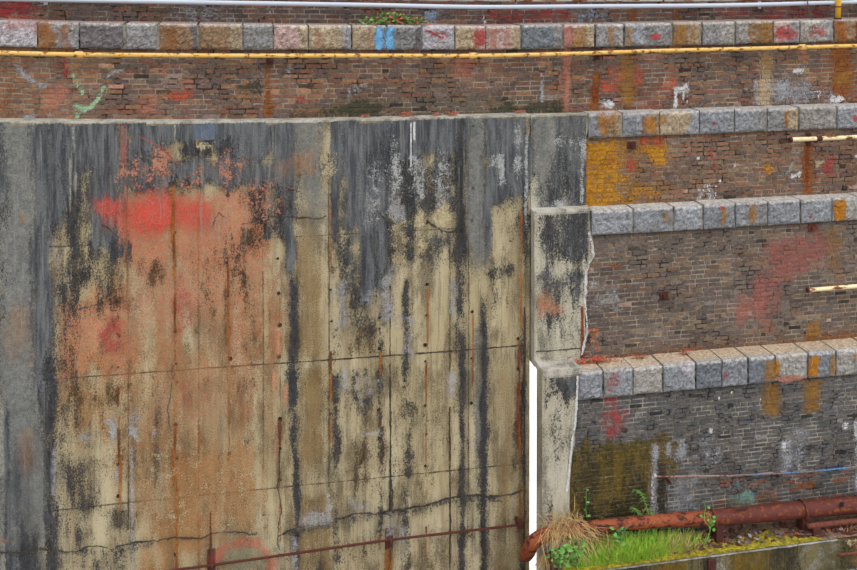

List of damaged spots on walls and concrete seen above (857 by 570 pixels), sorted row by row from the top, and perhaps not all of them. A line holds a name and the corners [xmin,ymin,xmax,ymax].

peeling [107,143,173,184]
peeling [199,149,294,228]
rust [801,141,815,195]
water stain [0,106,623,570]
water stain [545,376,719,521]
water stain [779,429,809,471]
crack [0,450,523,554]
rust [197,512,212,570]
rust [378,536,393,570]